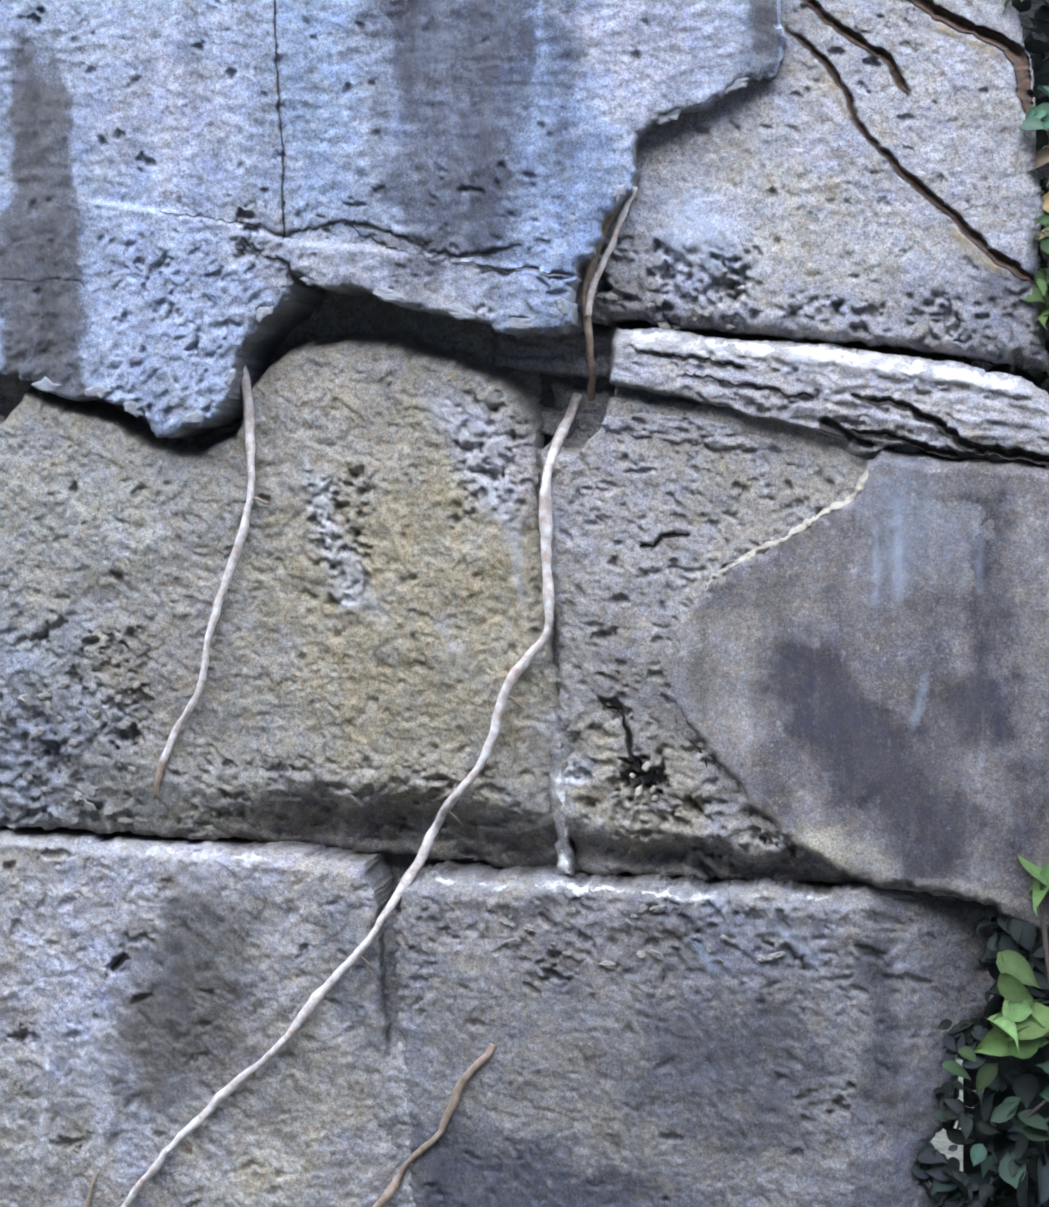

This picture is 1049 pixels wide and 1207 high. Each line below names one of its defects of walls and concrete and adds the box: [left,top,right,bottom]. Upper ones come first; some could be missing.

leakage [0,36,87,399]
crack [159,0,570,281]
leakage [367,0,533,280]
crack [785,0,1035,284]
crack [640,533,690,547]
crack [624,345,1049,468]
leakage [948,490,1020,741]
leakage [765,643,986,878]